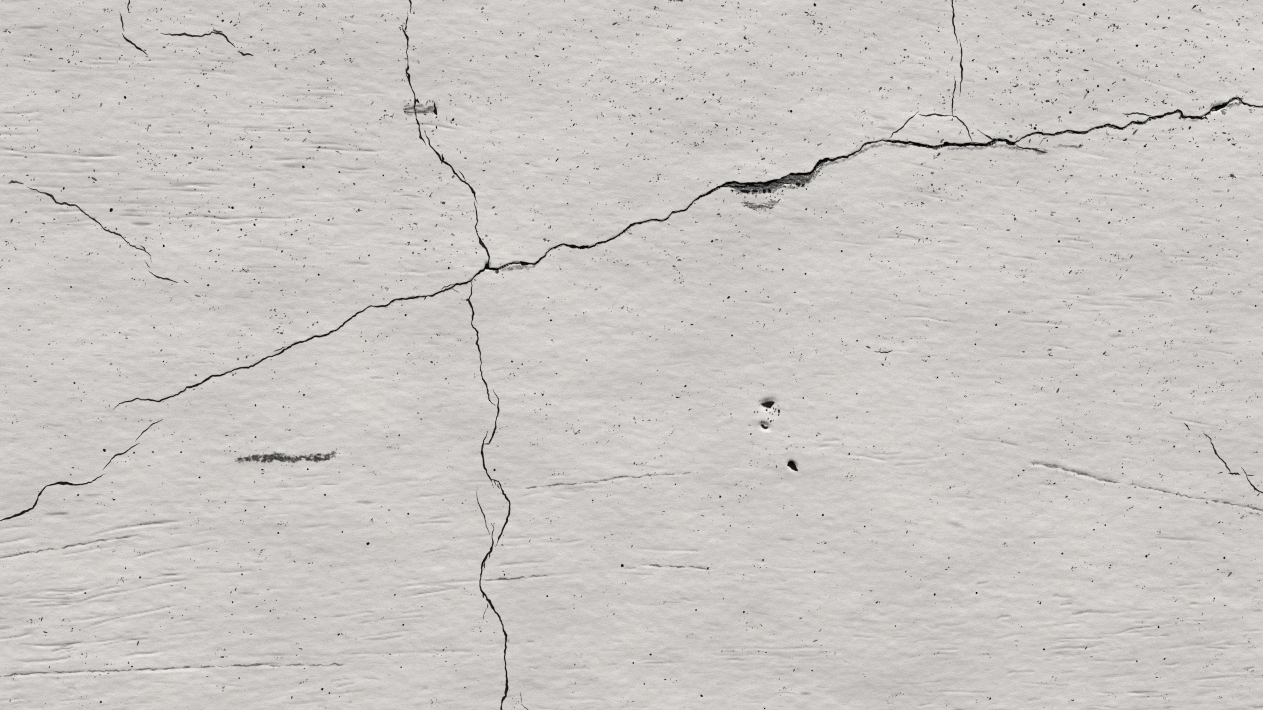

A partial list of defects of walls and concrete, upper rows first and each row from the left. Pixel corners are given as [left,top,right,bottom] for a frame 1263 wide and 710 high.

crack [826,0,1263,165]
crack [0,0,807,710]
crack [1184,423,1263,493]